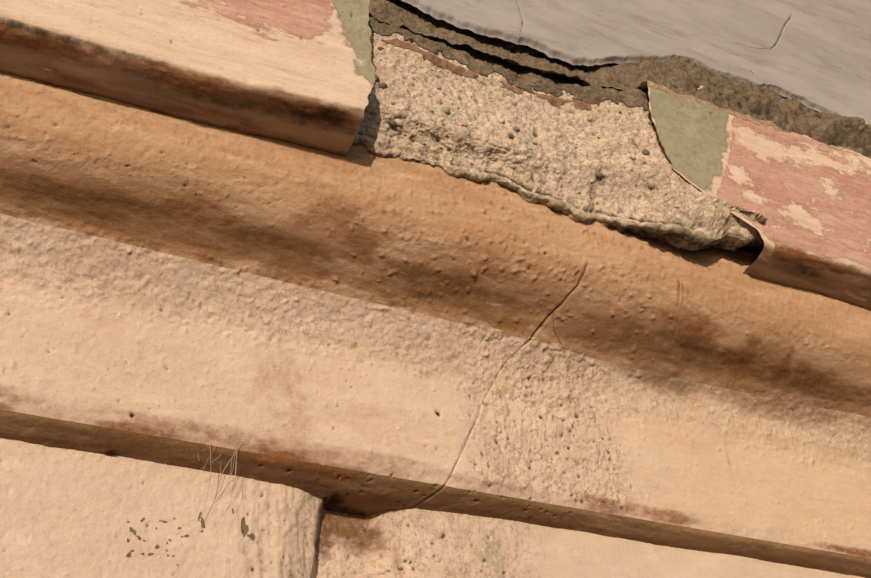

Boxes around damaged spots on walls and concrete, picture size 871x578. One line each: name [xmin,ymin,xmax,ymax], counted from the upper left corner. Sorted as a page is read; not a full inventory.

spalling [182,0,871,269]
crack [531,271,585,372]
crack [412,364,505,507]